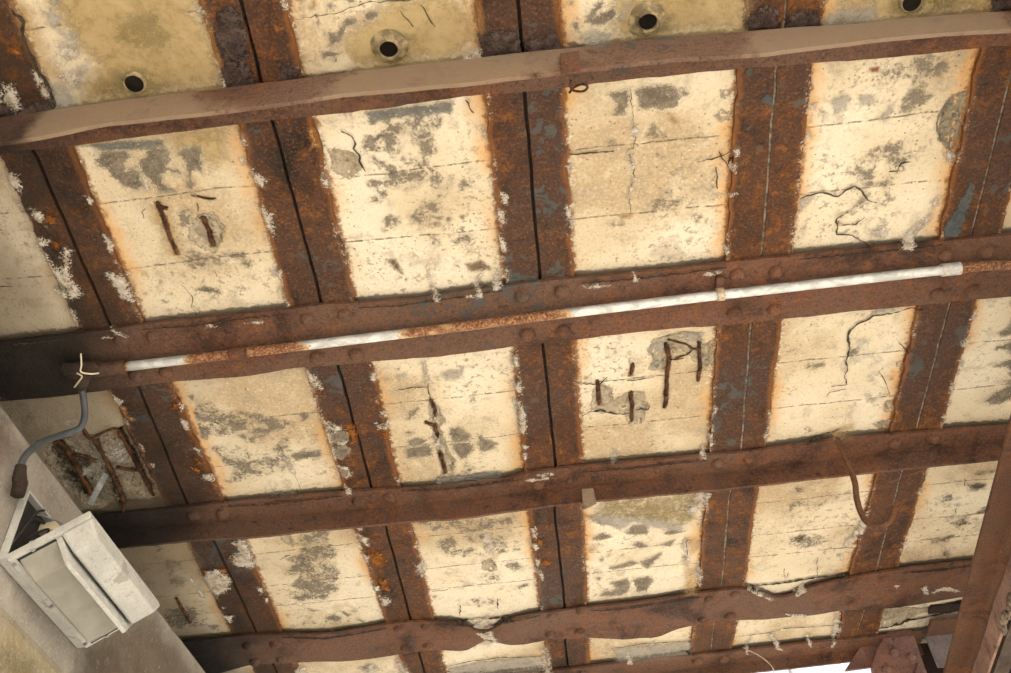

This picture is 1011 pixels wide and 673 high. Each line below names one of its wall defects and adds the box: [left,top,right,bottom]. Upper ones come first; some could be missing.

damp [826,0,988,22]
damp [0,83,23,115]
crack [341,131,366,172]
peeling [90,140,216,255]
spalling [188,212,225,253]
crack [798,186,943,260]
damp [105,271,136,303]
spalling [647,331,714,409]
crack [826,307,922,397]
spalling [590,379,650,425]
spalling [45,423,161,514]